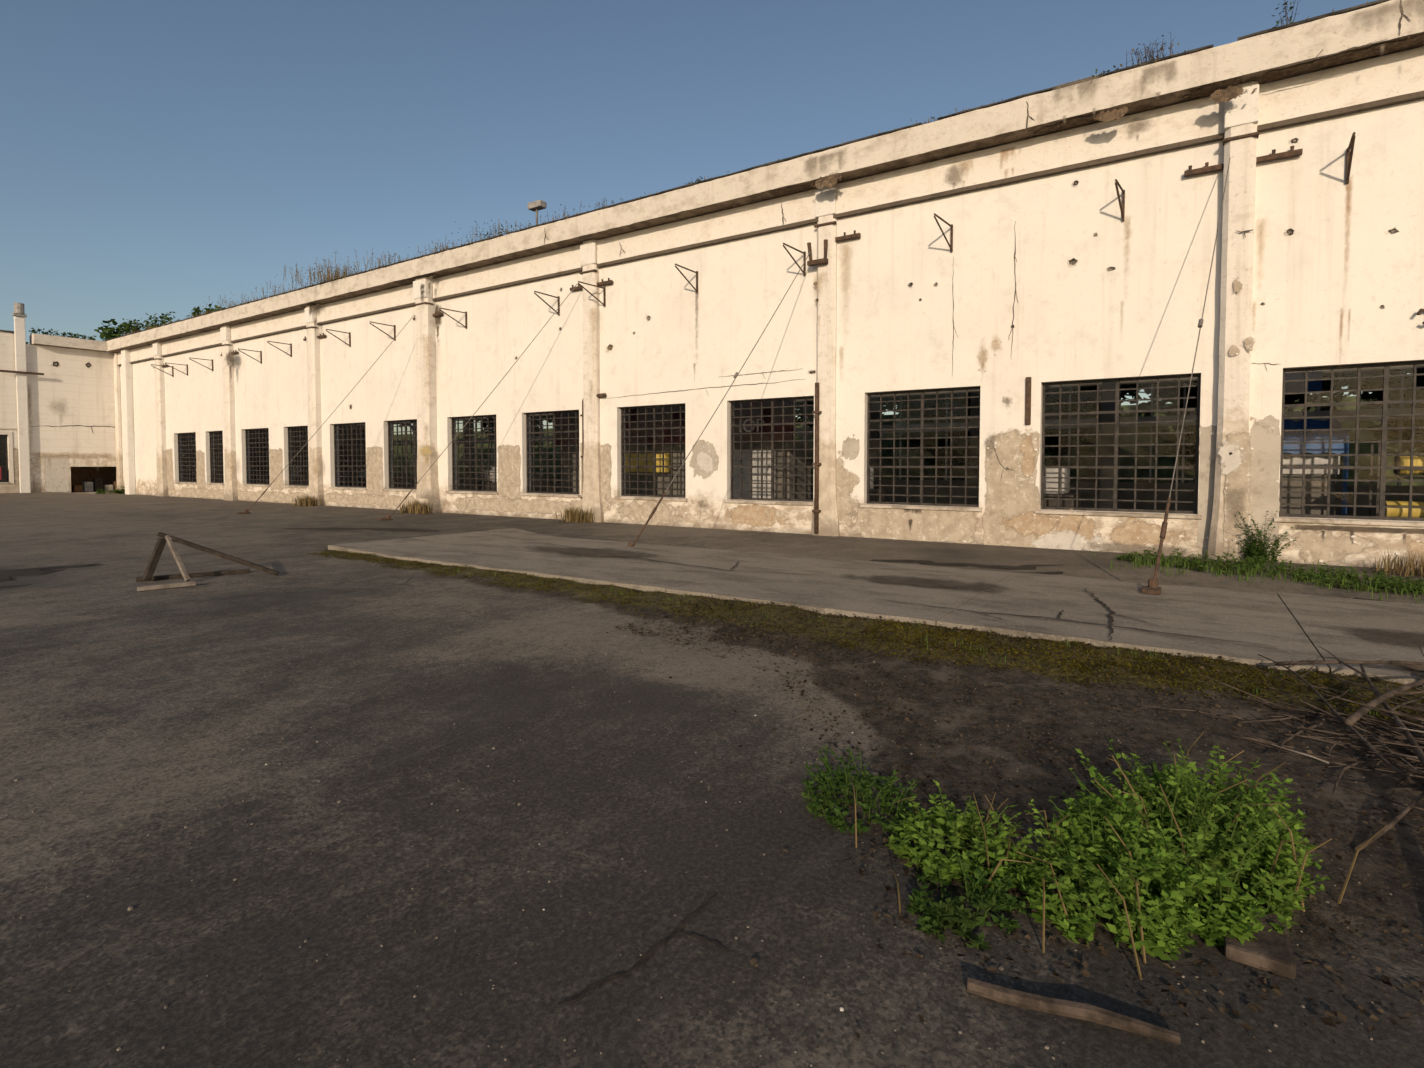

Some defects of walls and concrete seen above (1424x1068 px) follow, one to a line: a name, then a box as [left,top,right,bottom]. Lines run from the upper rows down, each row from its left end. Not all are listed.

spalling [1179,34,1424,103]
peeling [836,415,1378,564]